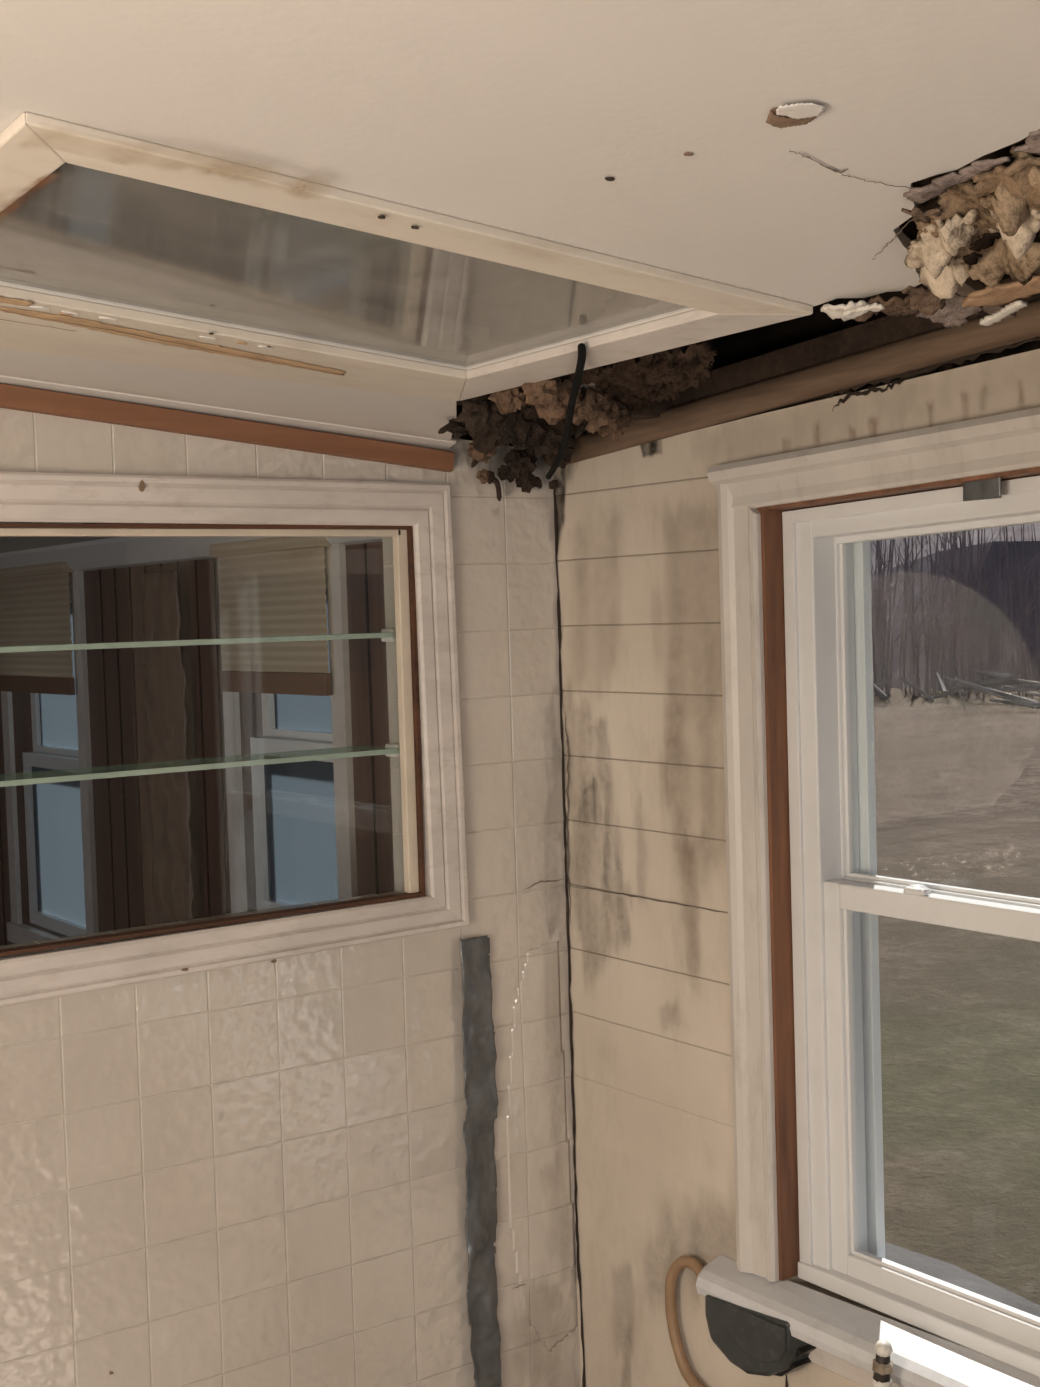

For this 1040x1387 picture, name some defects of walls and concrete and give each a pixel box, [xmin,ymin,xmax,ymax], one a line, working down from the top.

crack [789,151,913,260]
spalling [821,295,929,322]